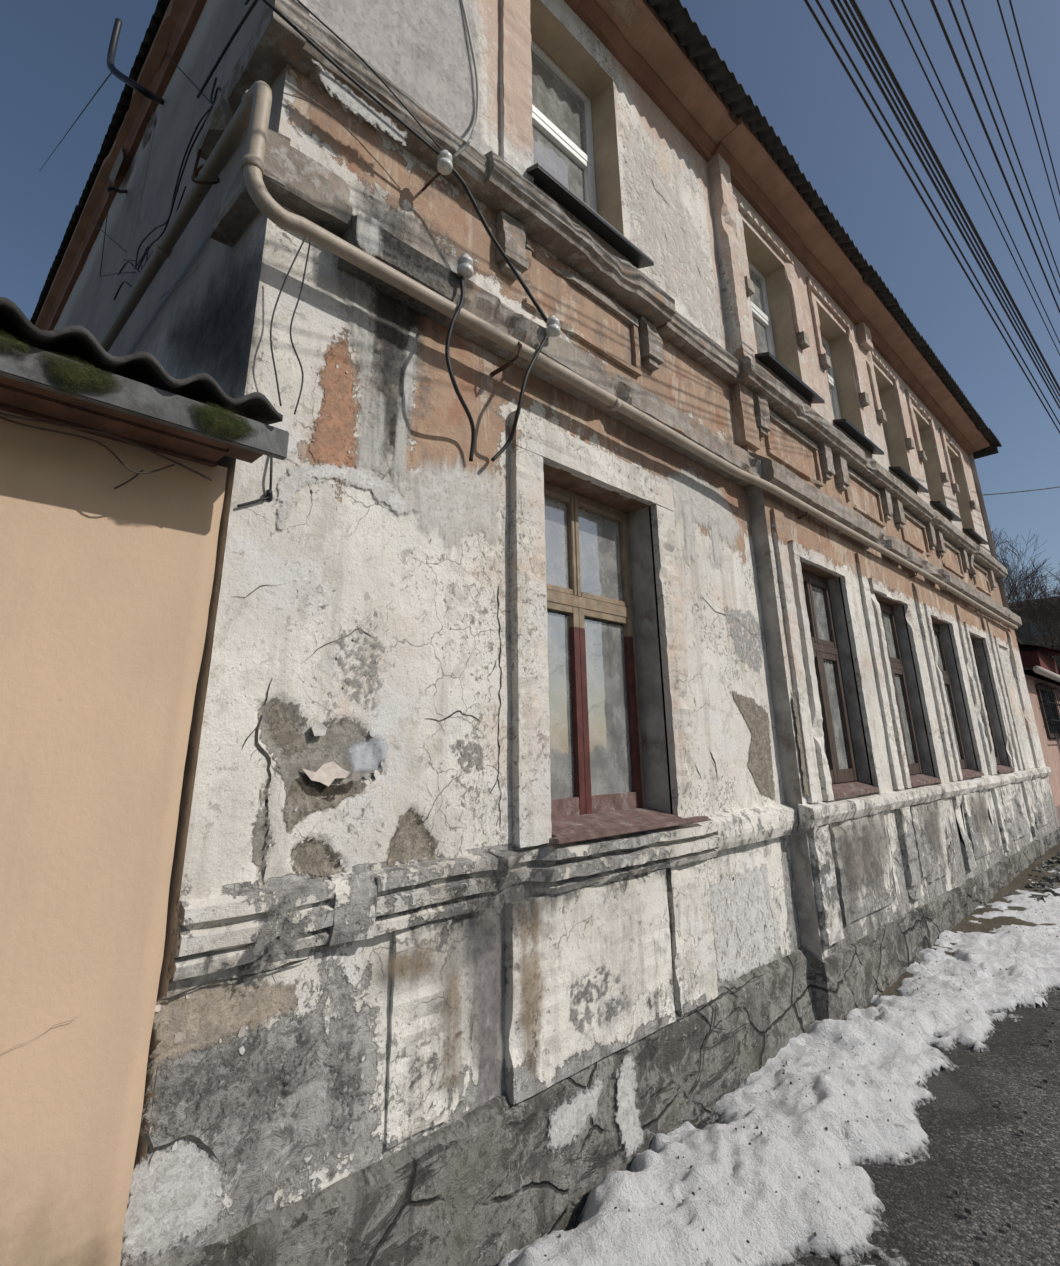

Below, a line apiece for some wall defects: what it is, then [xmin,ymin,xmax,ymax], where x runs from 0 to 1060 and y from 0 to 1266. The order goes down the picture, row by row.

peeling [312,59,407,146]
leakage [169,262,255,395]
crack [242,678,281,882]
flaking render [252,626,388,881]
crack [301,627,377,664]
crack [424,583,502,828]
flaking render [730,690,775,800]
leakage [839,820,885,881]
leakage [923,810,938,848]
leakage [468,854,553,1095]
crack [672,969,764,1097]
flaking render [121,977,297,1266]